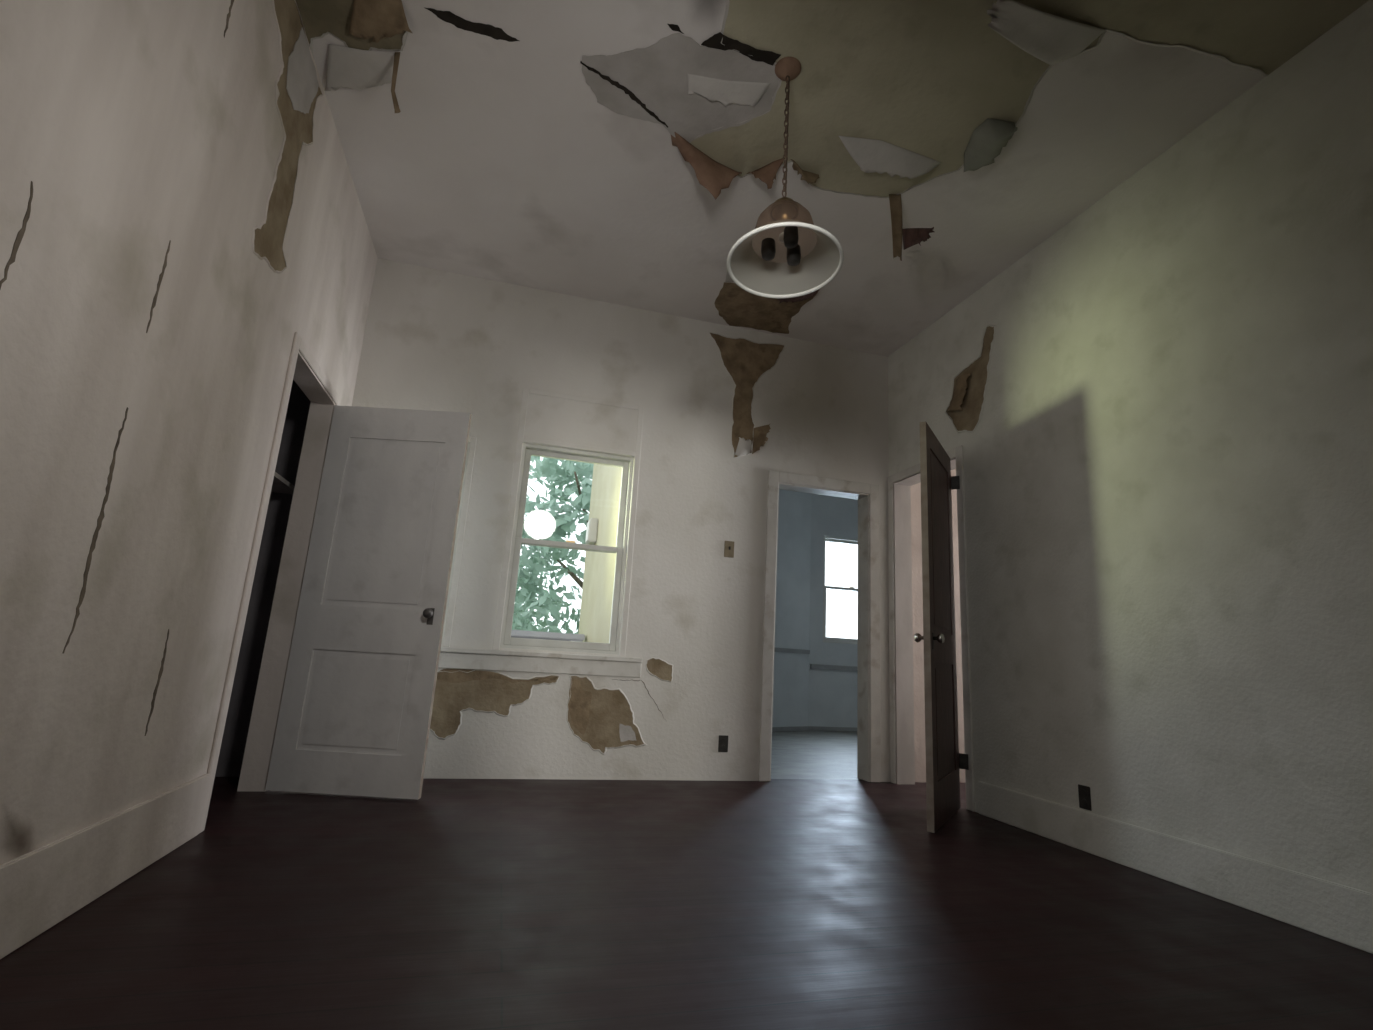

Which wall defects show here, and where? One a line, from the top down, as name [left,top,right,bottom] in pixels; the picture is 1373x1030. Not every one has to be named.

crack [224,0,234,38]
crack [425,8,519,42]
peeling [252,0,412,273]
peeling [580,0,1369,261]
crack [0,181,33,290]
crack [146,240,171,333]
peeling [709,270,820,458]
peeling [945,325,996,433]
crack [63,407,128,654]
peeling [430,657,673,755]